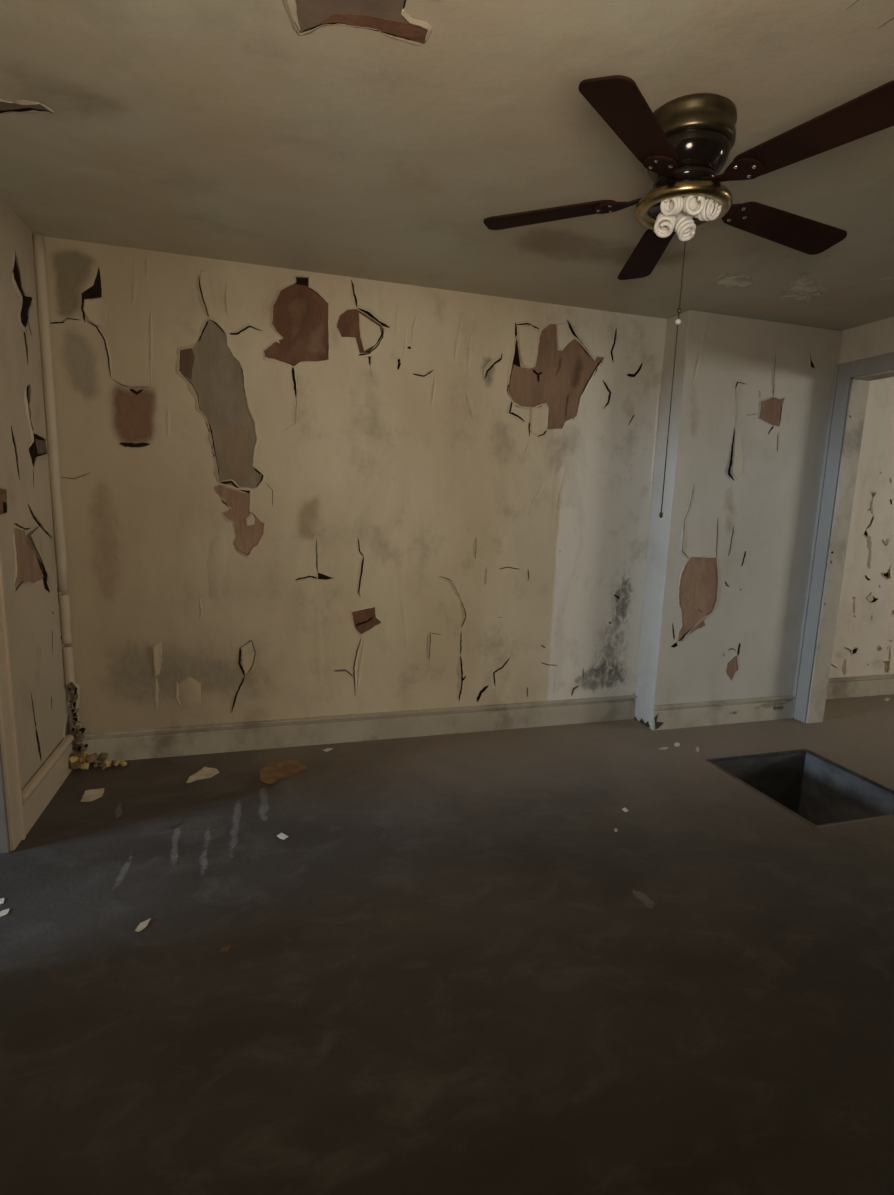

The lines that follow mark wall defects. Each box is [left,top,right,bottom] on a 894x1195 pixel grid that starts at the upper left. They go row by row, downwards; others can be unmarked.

peeling [282,0,433,45]
peeling [11,249,33,365]
peeling [24,382,48,485]
peeling [81,267,171,448]
peeling [176,270,390,557]
peeling [507,319,605,454]
peeling [728,354,785,481]
peeling [0,487,60,608]
peeling [350,606,382,636]
crack [426,537,529,702]
peeling [670,485,719,648]
peeling [852,491,893,621]